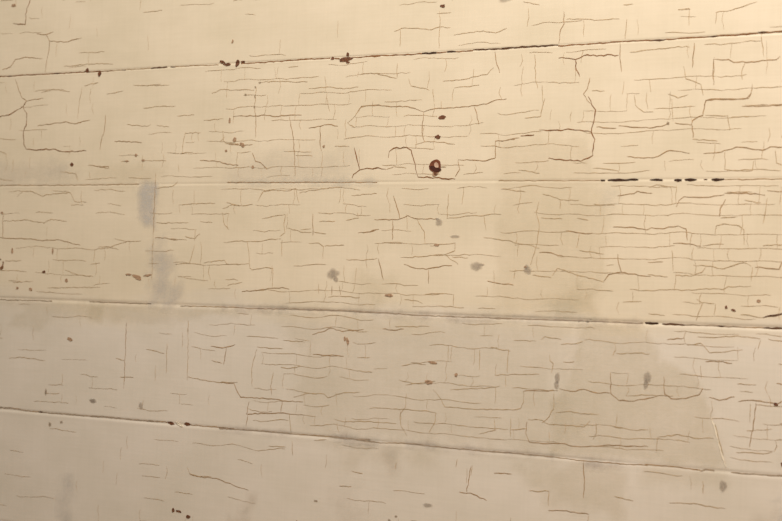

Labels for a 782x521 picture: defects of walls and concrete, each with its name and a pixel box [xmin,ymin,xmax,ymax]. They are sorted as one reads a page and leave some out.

crack [0,1,782,320]
crack [187,328,363,454]
crack [316,335,782,518]